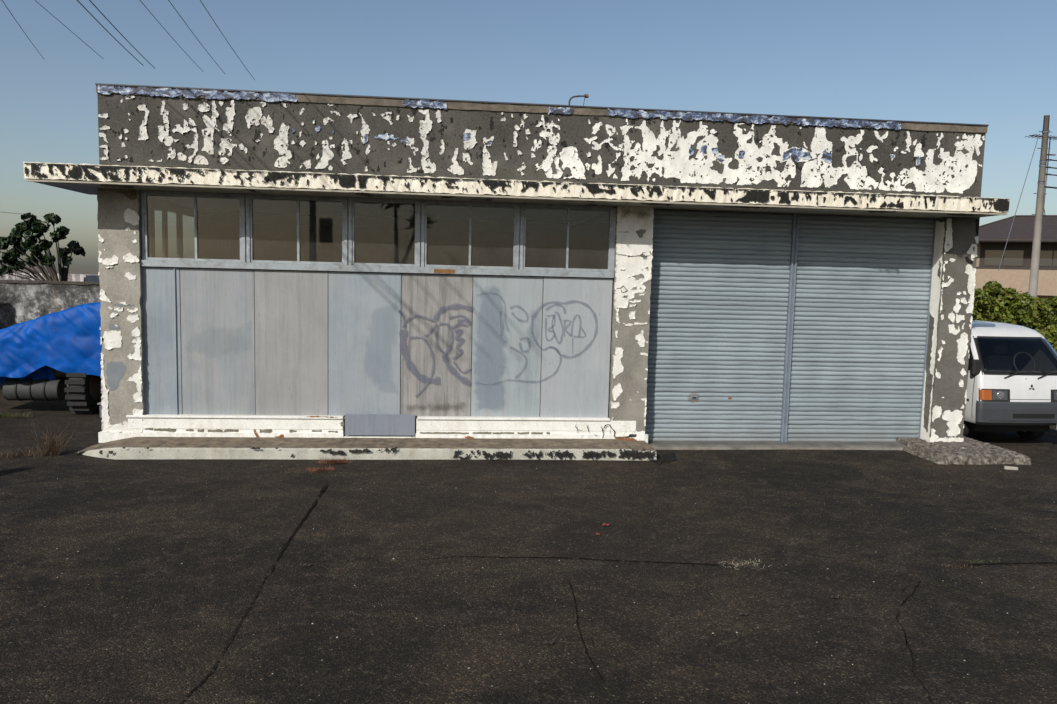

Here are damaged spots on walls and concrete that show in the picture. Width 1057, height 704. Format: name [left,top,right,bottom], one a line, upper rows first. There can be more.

peeling [98,85,985,194]
peeling [98,208,139,280]
peeling [99,289,239,433]
peeling [610,206,654,441]
peeling [920,218,979,438]